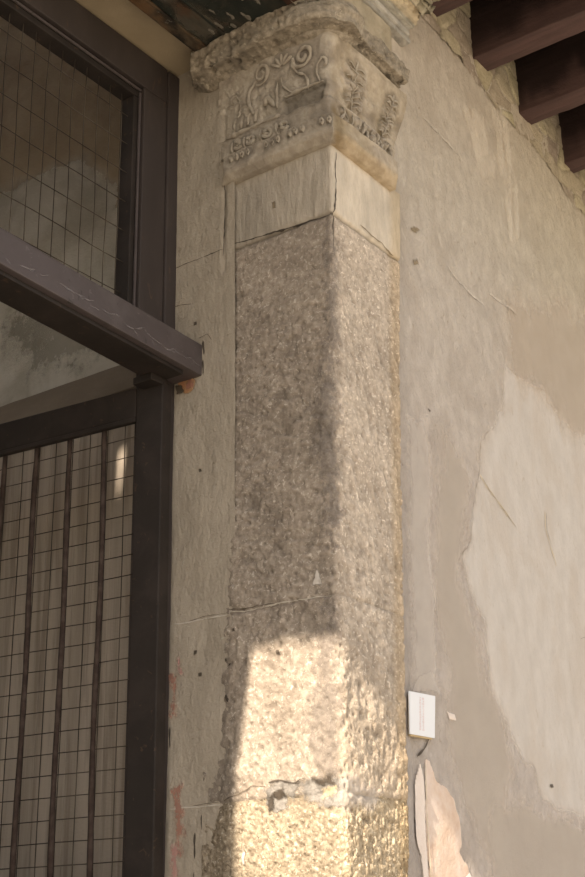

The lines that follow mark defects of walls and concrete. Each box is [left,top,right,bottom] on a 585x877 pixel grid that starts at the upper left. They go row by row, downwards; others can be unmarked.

crack [176,595,331,624]
flaking render [463,369,585,816]
flaking render [415,739,471,877]